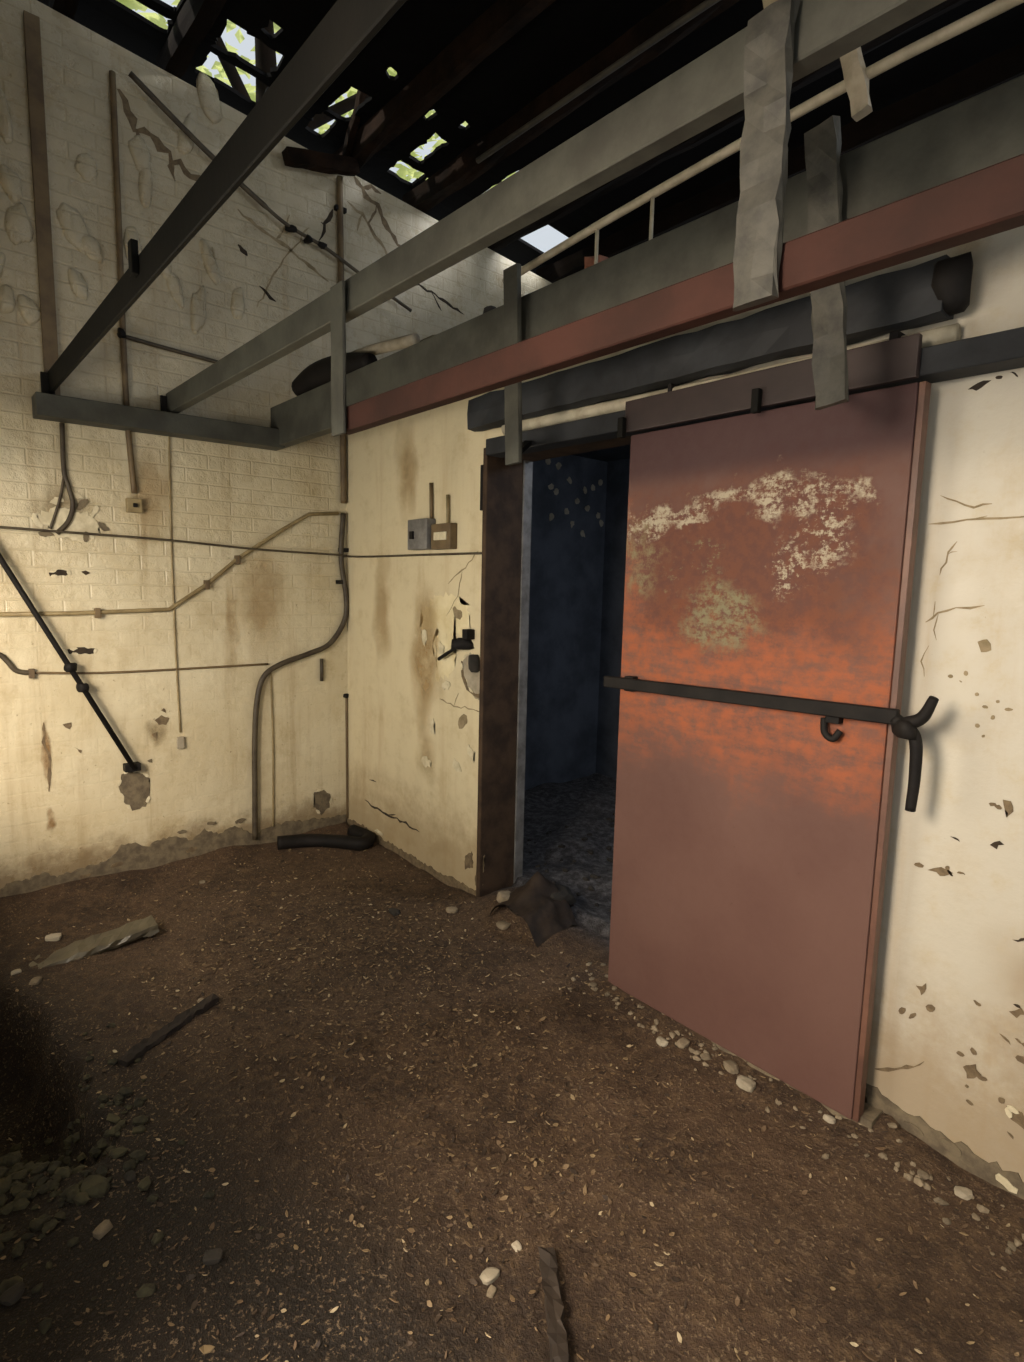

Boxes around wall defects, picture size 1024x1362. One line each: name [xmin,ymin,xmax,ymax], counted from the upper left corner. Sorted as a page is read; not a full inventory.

crack [117,89,201,181]
crack [237,176,400,306]
crack [416,284,464,315]
spalling [118,759,152,811]
spalling [0,789,485,898]
spalling [914,862,965,876]
spalling [898,983,935,1019]
spalling [956,1047,987,1106]
spalling [865,1083,1024,1200]